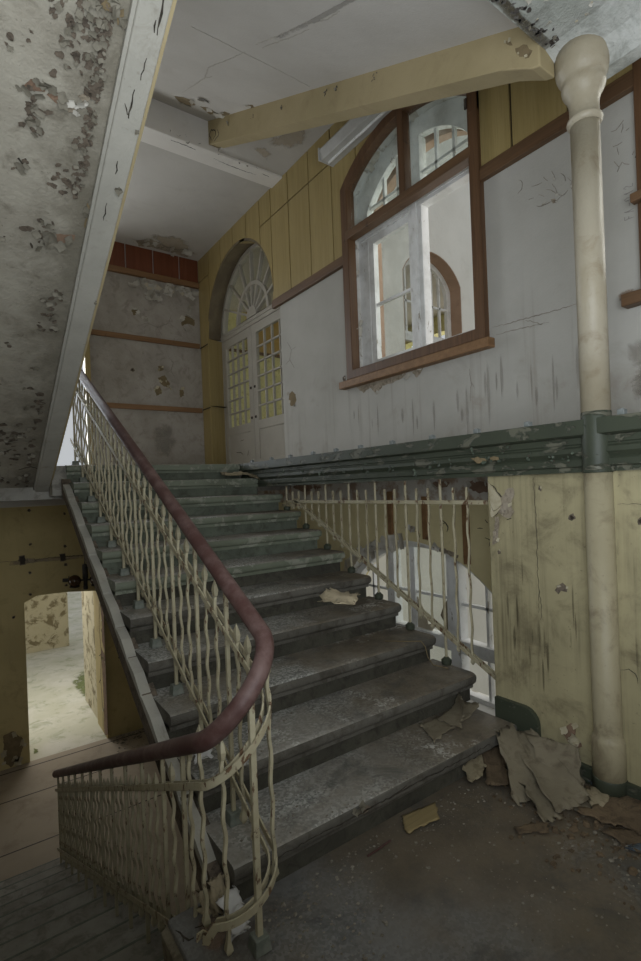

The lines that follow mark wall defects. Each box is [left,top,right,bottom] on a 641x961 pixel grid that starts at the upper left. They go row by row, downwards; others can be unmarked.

crack [154,0,164,36]
peeling [15,0,128,228]
crack [125,58,147,119]
peeling [174,96,230,125]
peeling [11,159,30,175]
peeling [128,278,199,331]
spalling [466,479,515,554]
peeling [0,731,28,767]